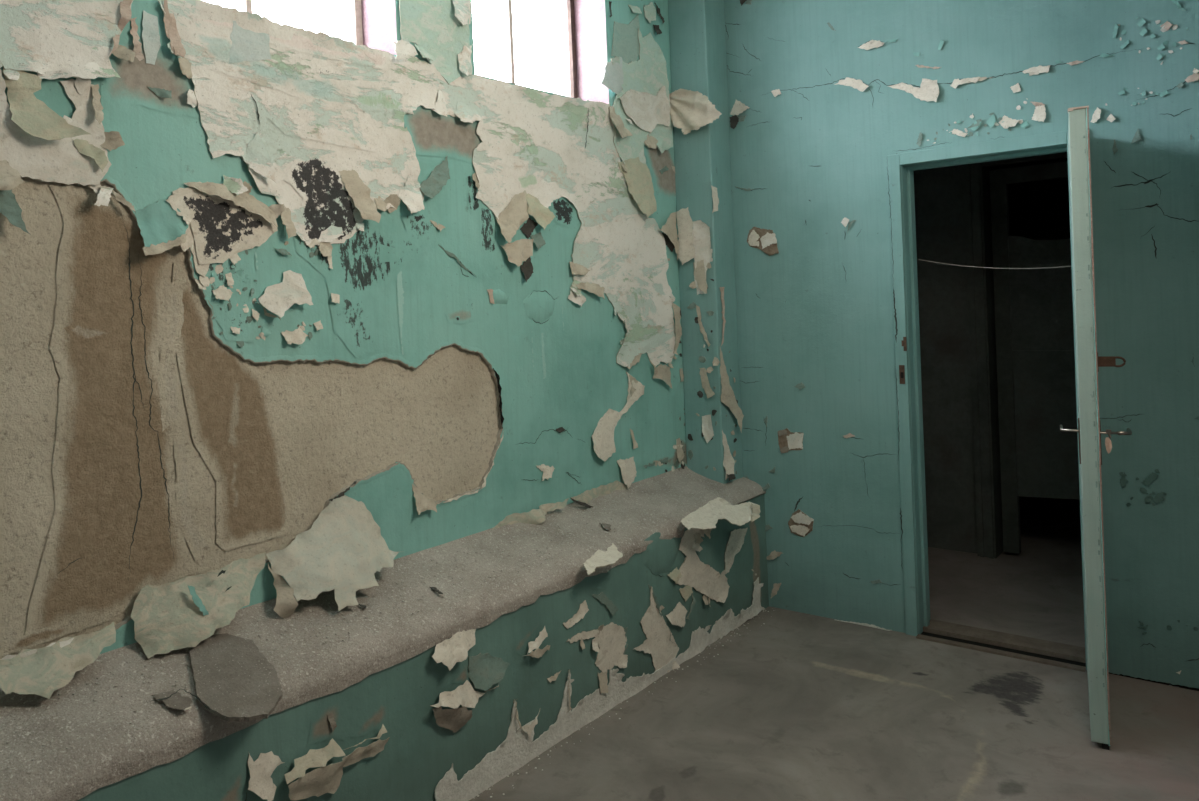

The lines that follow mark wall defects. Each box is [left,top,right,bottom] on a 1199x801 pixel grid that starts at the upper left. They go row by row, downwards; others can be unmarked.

crack [725,23,1144,127]
peeling [899,83,1046,151]
peeling [1090,103,1115,123]
crack [1118,68,1199,116]
water stain [284,105,497,358]
flaking render [747,227,779,256]
crack [1104,161,1196,257]
water stain [0,185,293,657]
crack [121,214,174,581]
peeling [0,0,773,699]
peeling [431,617,550,736]
water stain [806,659,1055,801]